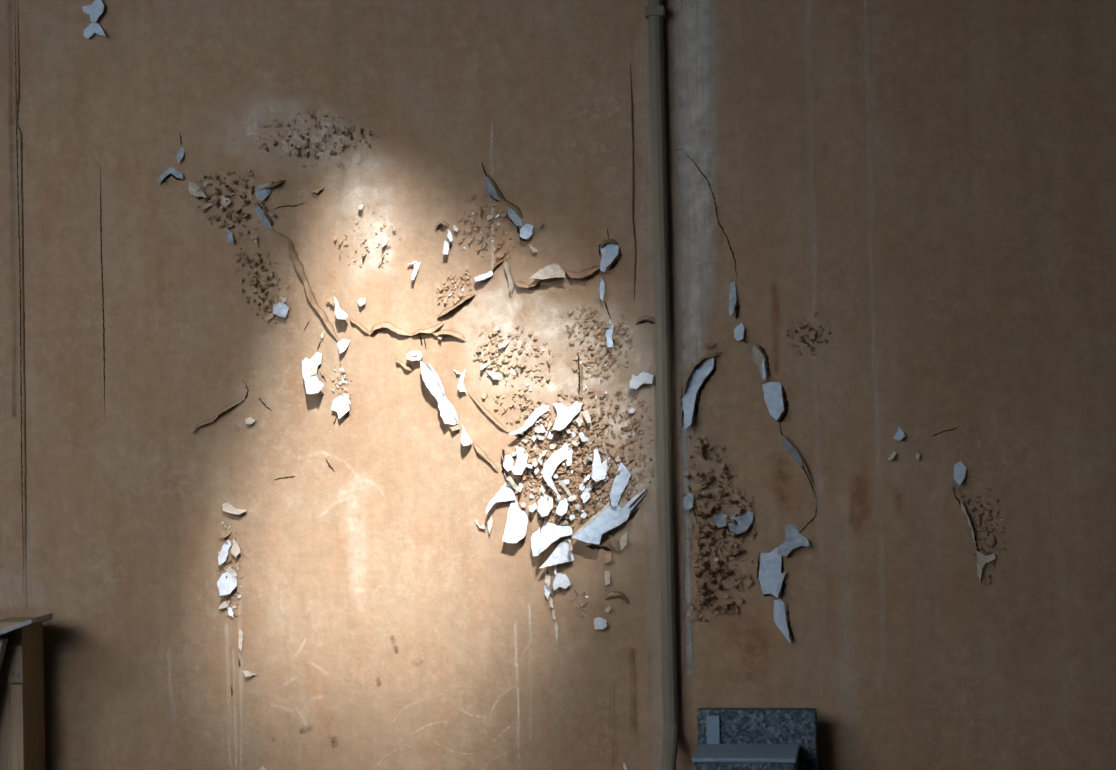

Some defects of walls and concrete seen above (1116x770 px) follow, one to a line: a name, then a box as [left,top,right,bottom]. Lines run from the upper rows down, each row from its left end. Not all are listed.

peeling [82,0,106,39]
peeling [435,221,458,254]
peeling [482,163,543,252]
crack [674,149,737,274]
crack [273,230,475,353]
peeling [475,228,622,347]
peeling [302,341,352,425]
crack [453,369,511,433]
crack [576,355,584,394]
peeling [396,351,656,642]
peeling [216,502,256,677]